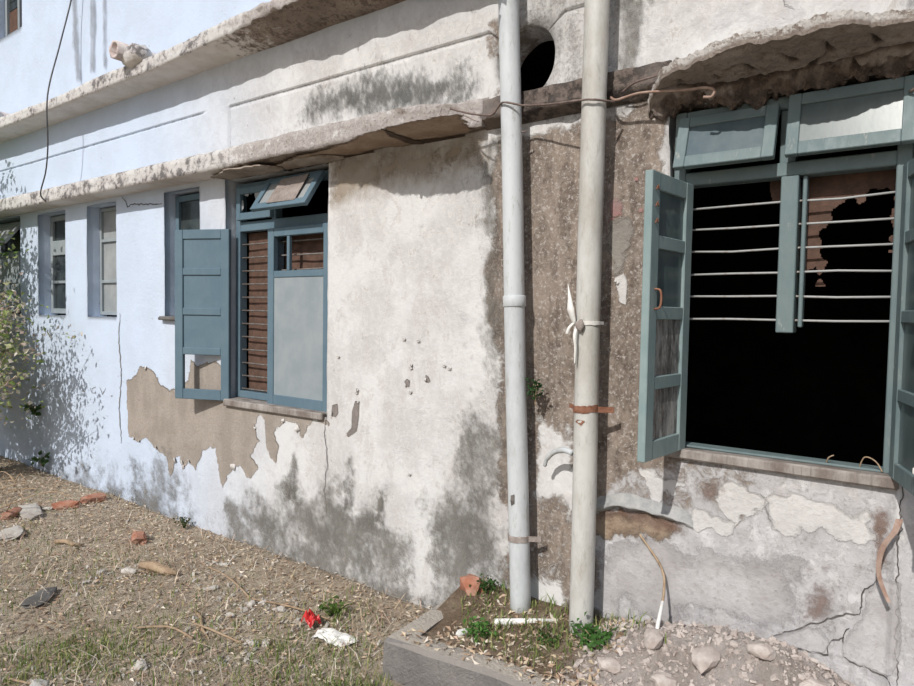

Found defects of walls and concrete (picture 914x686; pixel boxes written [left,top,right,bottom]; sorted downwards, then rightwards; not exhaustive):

leakage [302,65,474,123]
spalling [609,86,716,101]
spalling [210,114,474,180]
crack [116,322,124,439]
peeling [126,360,338,488]
peeling [345,389,359,437]
leakage [224,454,411,603]
leakage [421,414,502,608]
peeling [639,467,686,503]
peeling [691,481,877,545]
rust [874,512,888,562]
crack [773,487,904,685]